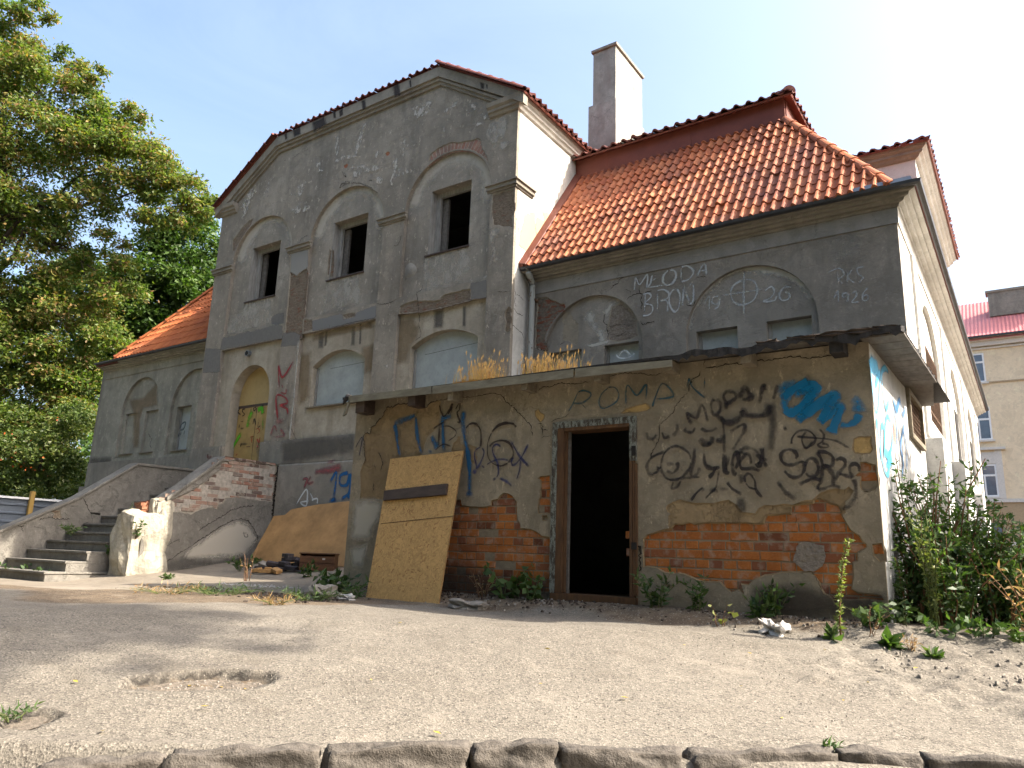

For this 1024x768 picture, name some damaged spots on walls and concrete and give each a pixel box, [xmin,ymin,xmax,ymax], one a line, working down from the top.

flaking render [535,297,566,351]
flaking render [134,456,277,515]
crack [167,466,279,561]
crack [363,393,568,490]
flaking render [446,475,550,592]
crack [650,355,832,456]
flaking render [642,436,887,601]